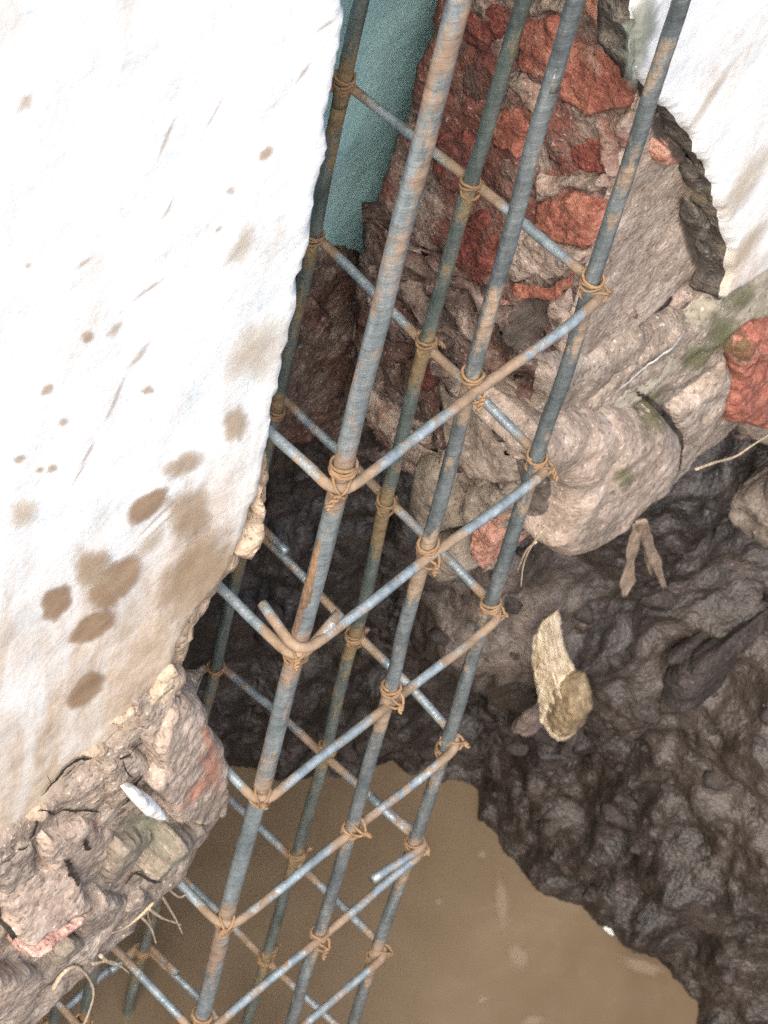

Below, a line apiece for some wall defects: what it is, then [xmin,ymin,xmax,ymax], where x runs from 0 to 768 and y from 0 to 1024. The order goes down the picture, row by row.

flaking render [559,42,637,115]
flaking render [534,189,608,262]
flaking render [722,316,768,430]
crack [636,391,684,471]
water stain [130,489,205,531]
spalling [234,484,266,560]
water stain [42,586,71,620]
water stain [70,557,139,643]
rust [293,538,321,639]
water stain [68,674,104,708]
crack [3,742,143,863]
crack [64,839,92,886]